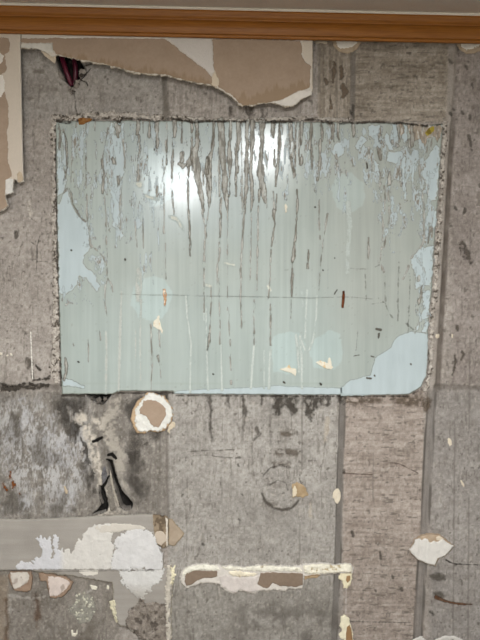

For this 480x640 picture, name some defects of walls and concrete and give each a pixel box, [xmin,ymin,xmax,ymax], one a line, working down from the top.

spalling [58,57,86,95]
water stain [58,124,72,180]
water stain [95,154,120,227]
crack [31,64,248,322]
crack [266,118,441,127]
water stain [366,133,391,273]
water stain [135,106,381,430]
peeling [174,123,441,396]
water stain [0,238,143,519]
water stain [393,395,431,412]
crack [92,436,133,515]